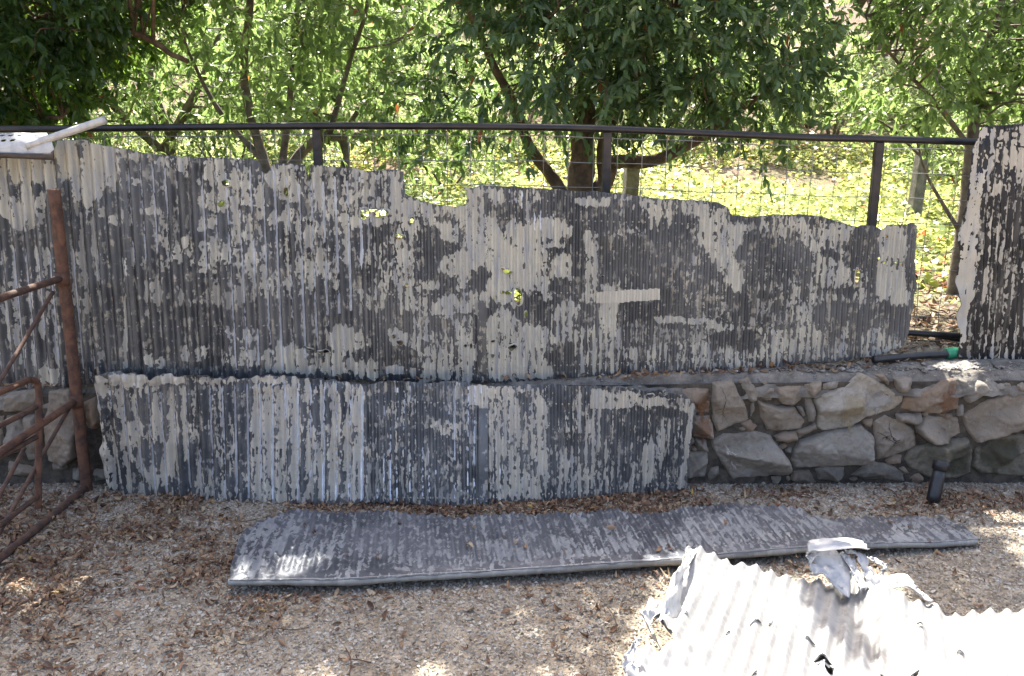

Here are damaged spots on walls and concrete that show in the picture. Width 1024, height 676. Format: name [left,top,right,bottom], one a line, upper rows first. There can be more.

peeling [0,139,979,580]
peeling [921,125,1024,371]